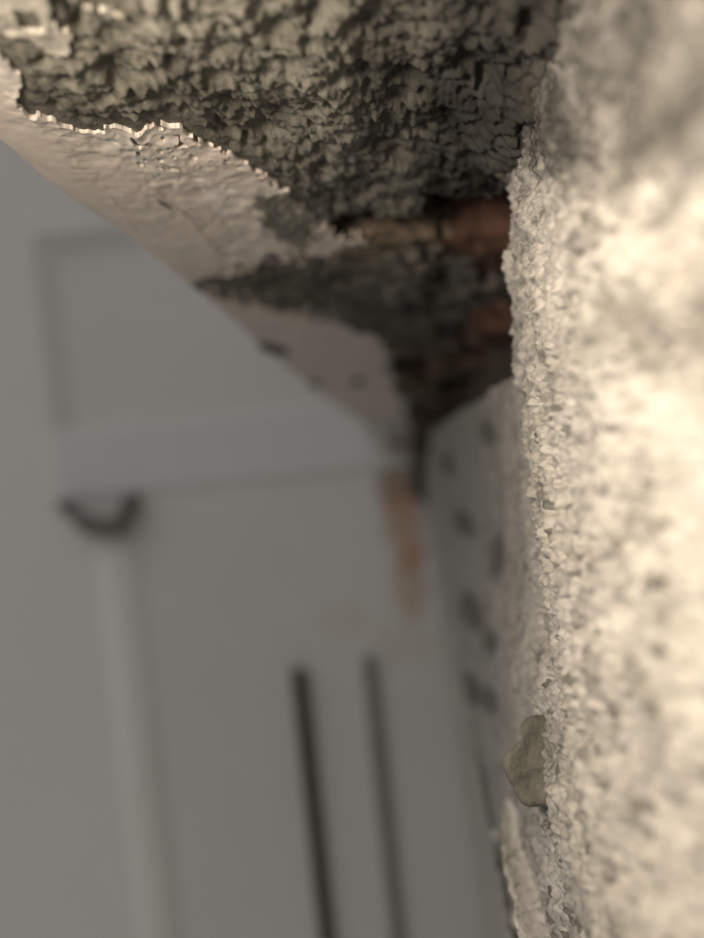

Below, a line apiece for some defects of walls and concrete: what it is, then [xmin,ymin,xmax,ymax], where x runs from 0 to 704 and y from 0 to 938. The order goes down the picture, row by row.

peeling [0,0,73,57]
peeling [83,1,126,22]
spalling [0,51,515,452]